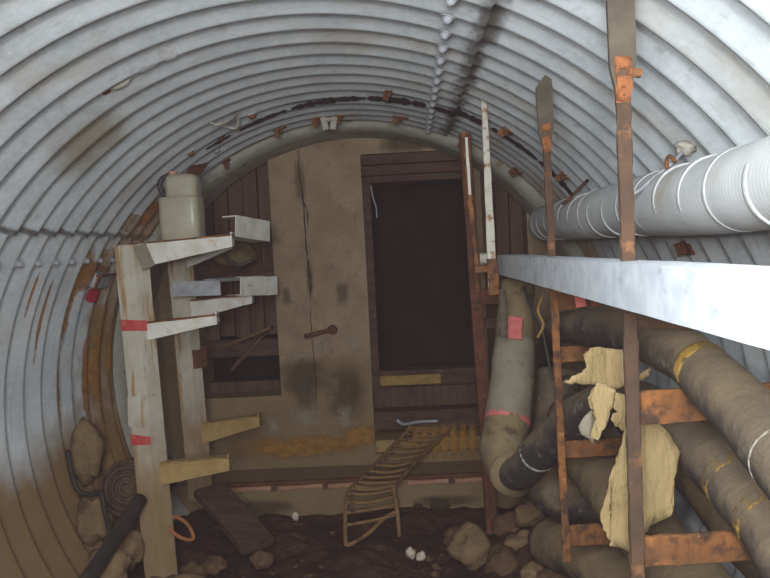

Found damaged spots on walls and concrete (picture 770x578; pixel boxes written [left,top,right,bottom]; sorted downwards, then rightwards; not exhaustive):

corrosion [541,122,552,153]
corrosion [35,284,52,349]
corrosion [60,251,93,340]
crack [298,160,317,416]
corrosion [82,307,115,422]